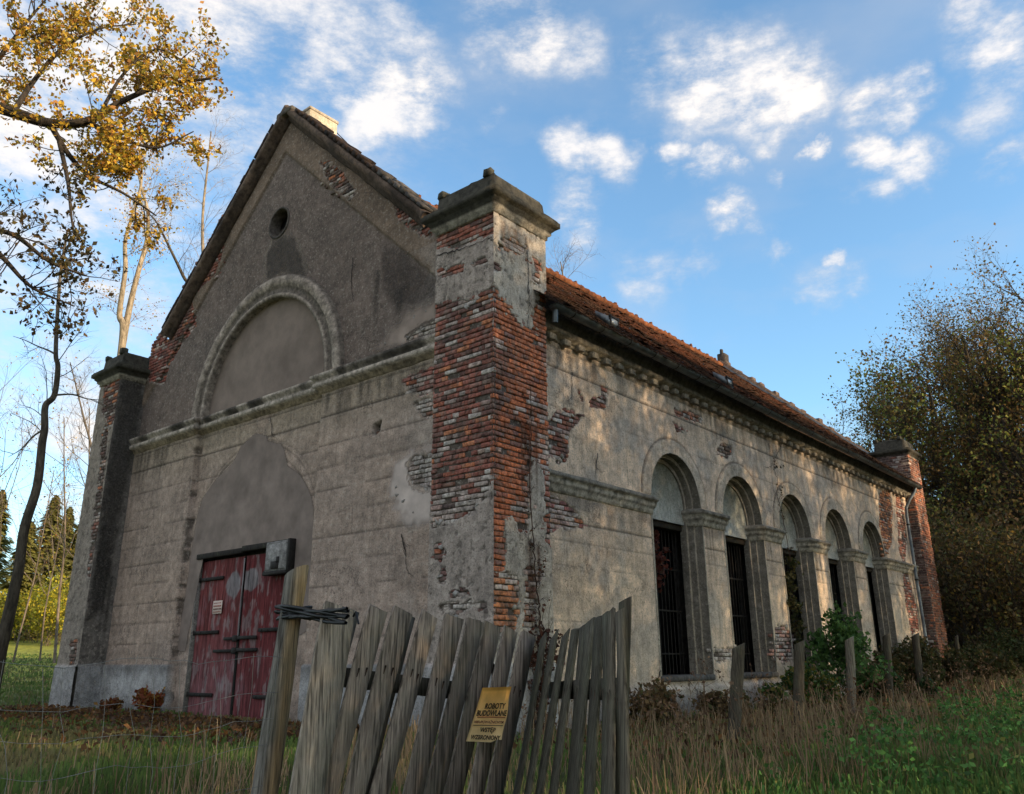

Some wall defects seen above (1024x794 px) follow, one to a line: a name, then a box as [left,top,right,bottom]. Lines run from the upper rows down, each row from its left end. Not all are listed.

spalling [320,160,356,201]
spalling [148,246,226,387]
spalling [87,379,120,577]
spalling [378,206,608,632]
spalling [878,490,919,634]
spalling [767,625,796,663]